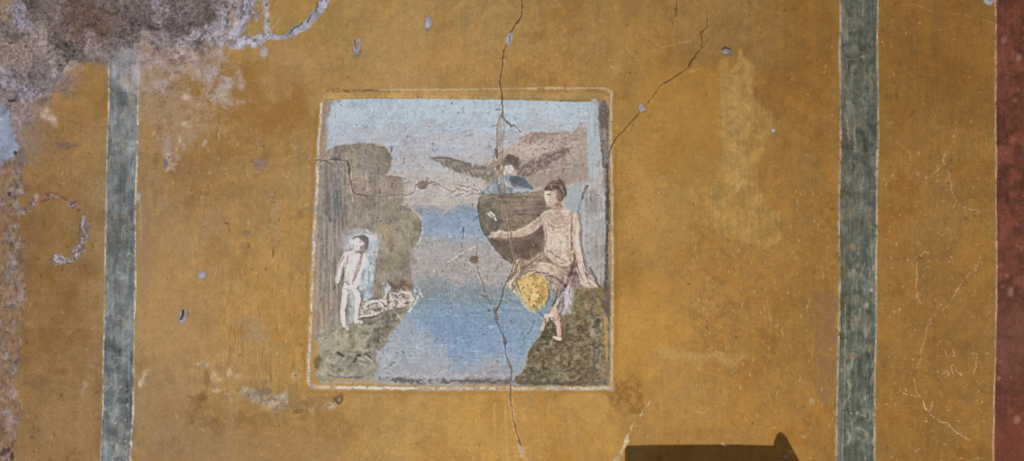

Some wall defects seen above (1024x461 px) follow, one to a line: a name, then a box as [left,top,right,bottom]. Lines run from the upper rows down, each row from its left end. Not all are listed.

crack [607,11,711,159]
peeling [0,99,92,338]
flaking render [177,308,189,326]
crack [292,0,537,461]